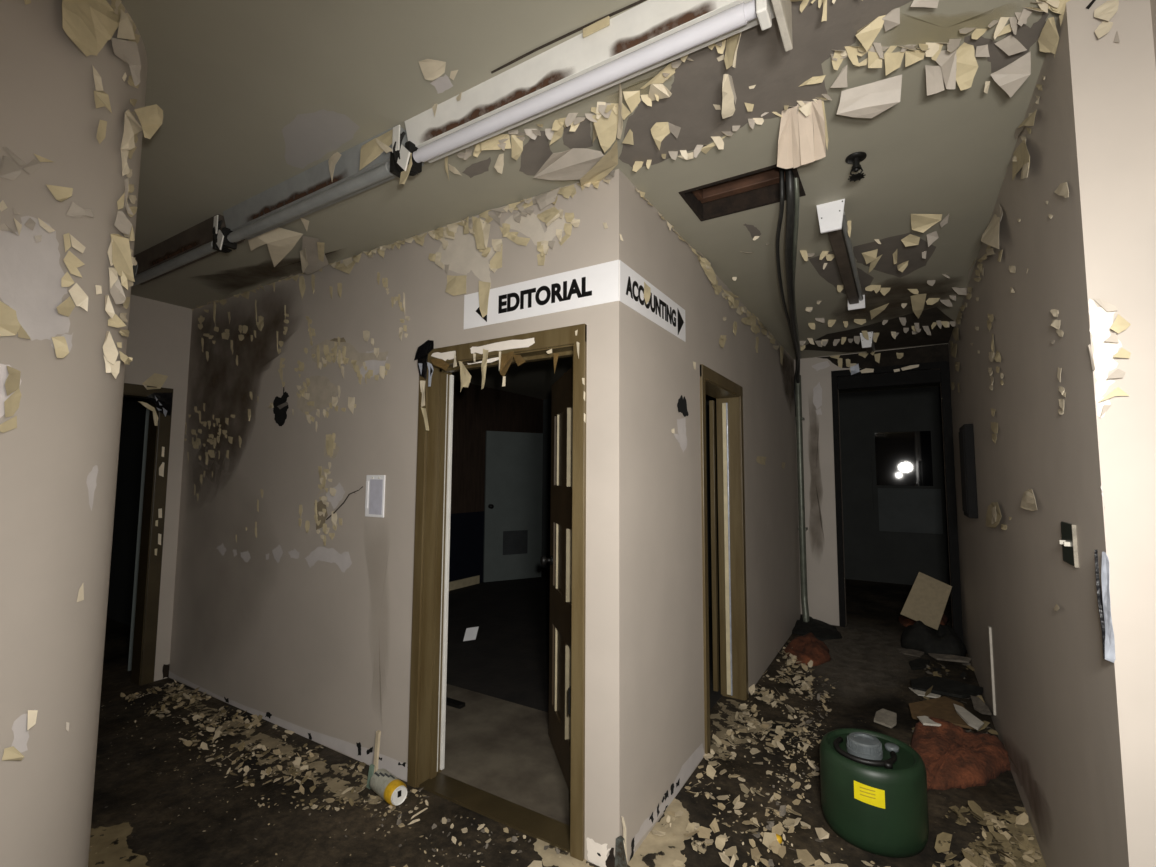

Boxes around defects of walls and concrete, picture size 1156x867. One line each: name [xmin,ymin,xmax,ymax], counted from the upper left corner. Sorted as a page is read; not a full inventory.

rust [613,5,711,55]
rust [425,72,565,141]
peeling [0,0,163,379]
peeling [184,0,1070,501]
peeling [0,364,22,433]
peeling [138,373,168,426]
leakage [195,308,285,473]
peeling [1088,299,1131,418]
flaking render [86,465,98,511]
peeling [266,433,352,573]
peeling [986,489,1037,530]